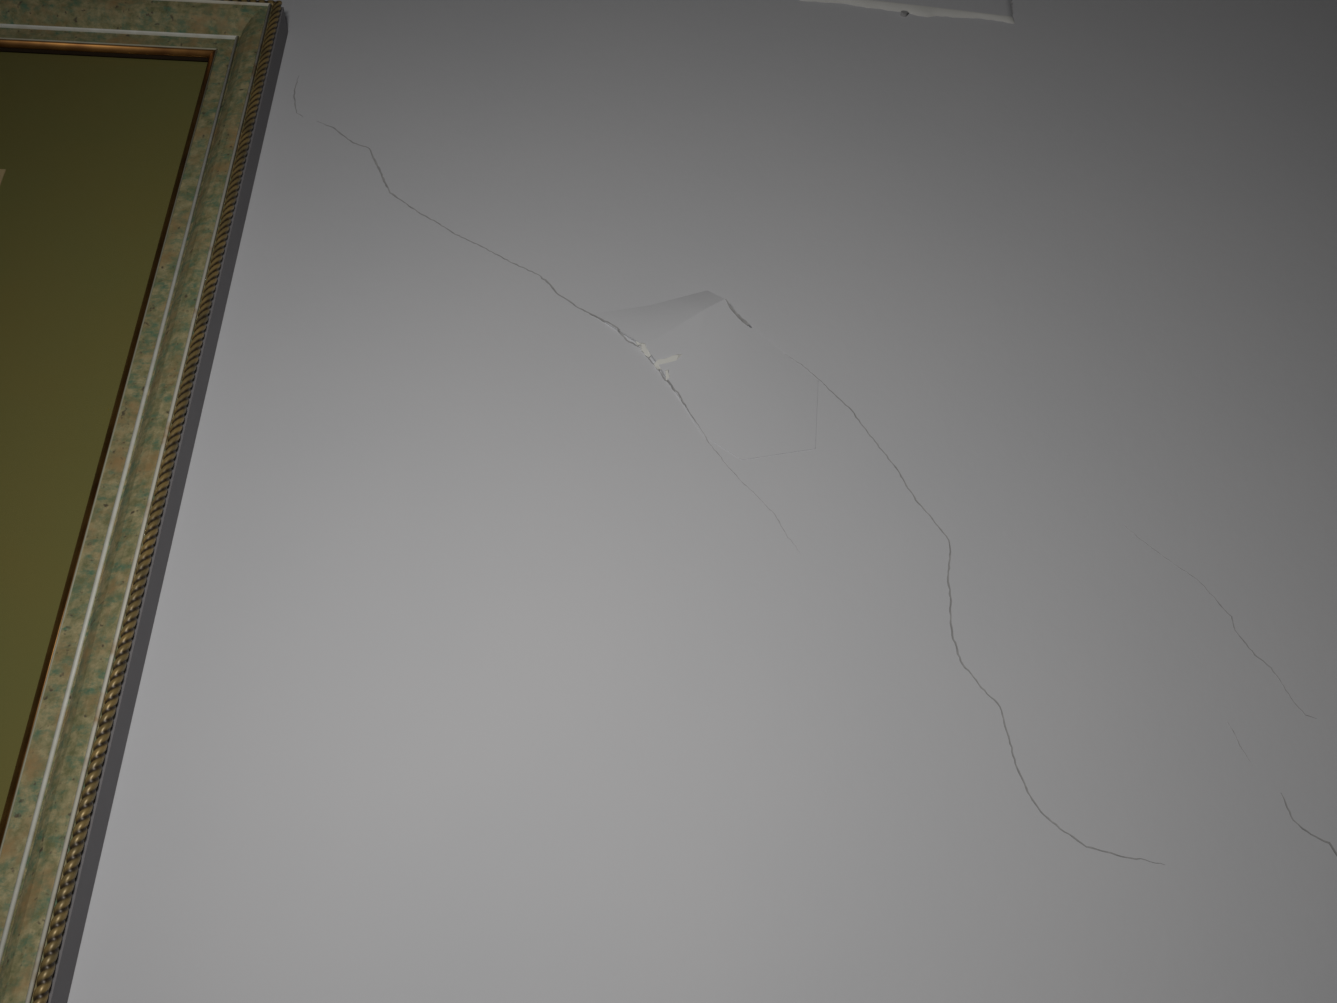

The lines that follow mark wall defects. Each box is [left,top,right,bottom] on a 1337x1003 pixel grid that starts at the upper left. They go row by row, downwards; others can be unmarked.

crack [293,76,800,553]
crack [785,354,1164,865]
crack [1123,524,1316,719]
crack [1281,794,1337,856]